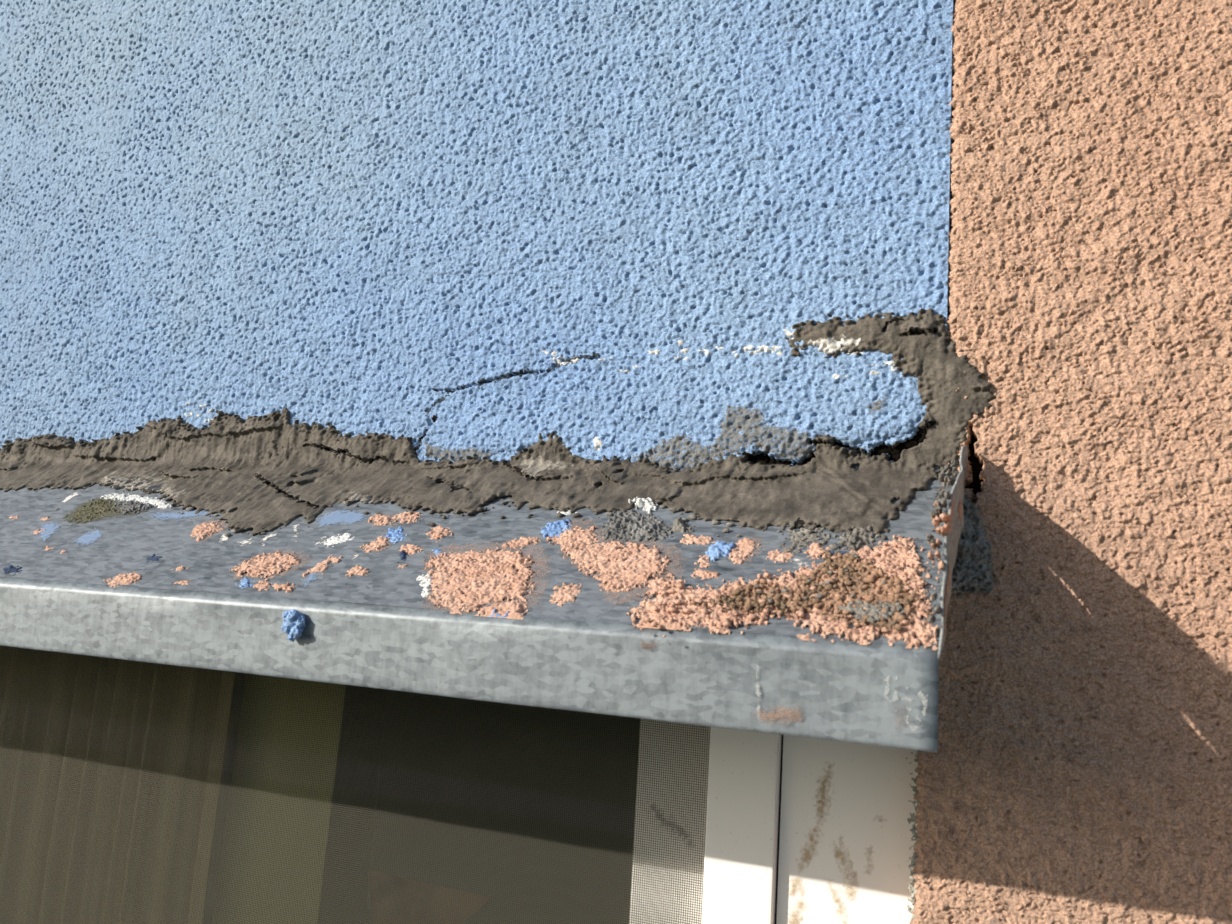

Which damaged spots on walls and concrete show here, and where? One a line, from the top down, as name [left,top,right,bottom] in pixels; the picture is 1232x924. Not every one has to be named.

peeling [542,350,580,366]
peeling [674,327,795,360]
peeling [870,361,901,375]
crack [303,352,600,493]
peeling [424,441,493,460]
peeling [631,405,816,470]
crack [255,473,320,509]
peeling [394,511,422,524]